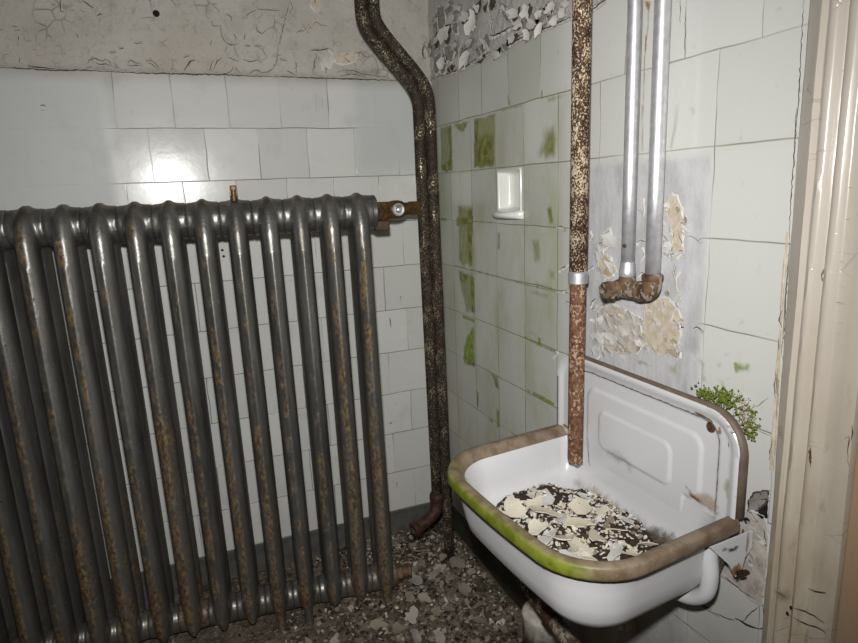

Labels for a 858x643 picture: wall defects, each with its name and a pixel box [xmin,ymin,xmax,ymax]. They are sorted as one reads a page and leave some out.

crack [0,0,398,81]
peeling [423,0,569,77]
crack [778,1,804,339]
peeling [594,227,627,283]
peeling [662,192,691,261]
peeling [590,290,683,361]
flaking render [719,490,771,607]